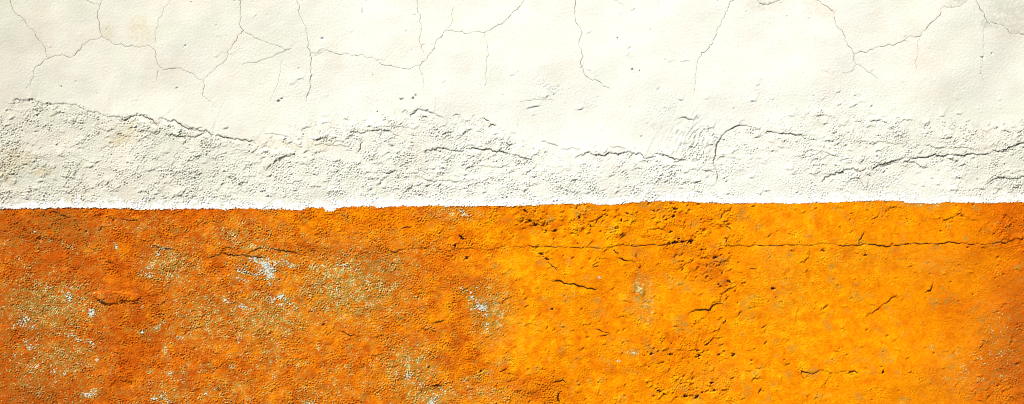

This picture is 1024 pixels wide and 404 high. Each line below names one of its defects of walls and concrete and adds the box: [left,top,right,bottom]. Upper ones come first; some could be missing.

crack [10,0,1024,186]
crack [209,248,322,258]
crack [386,226,693,290]
crack [689,207,1019,345]